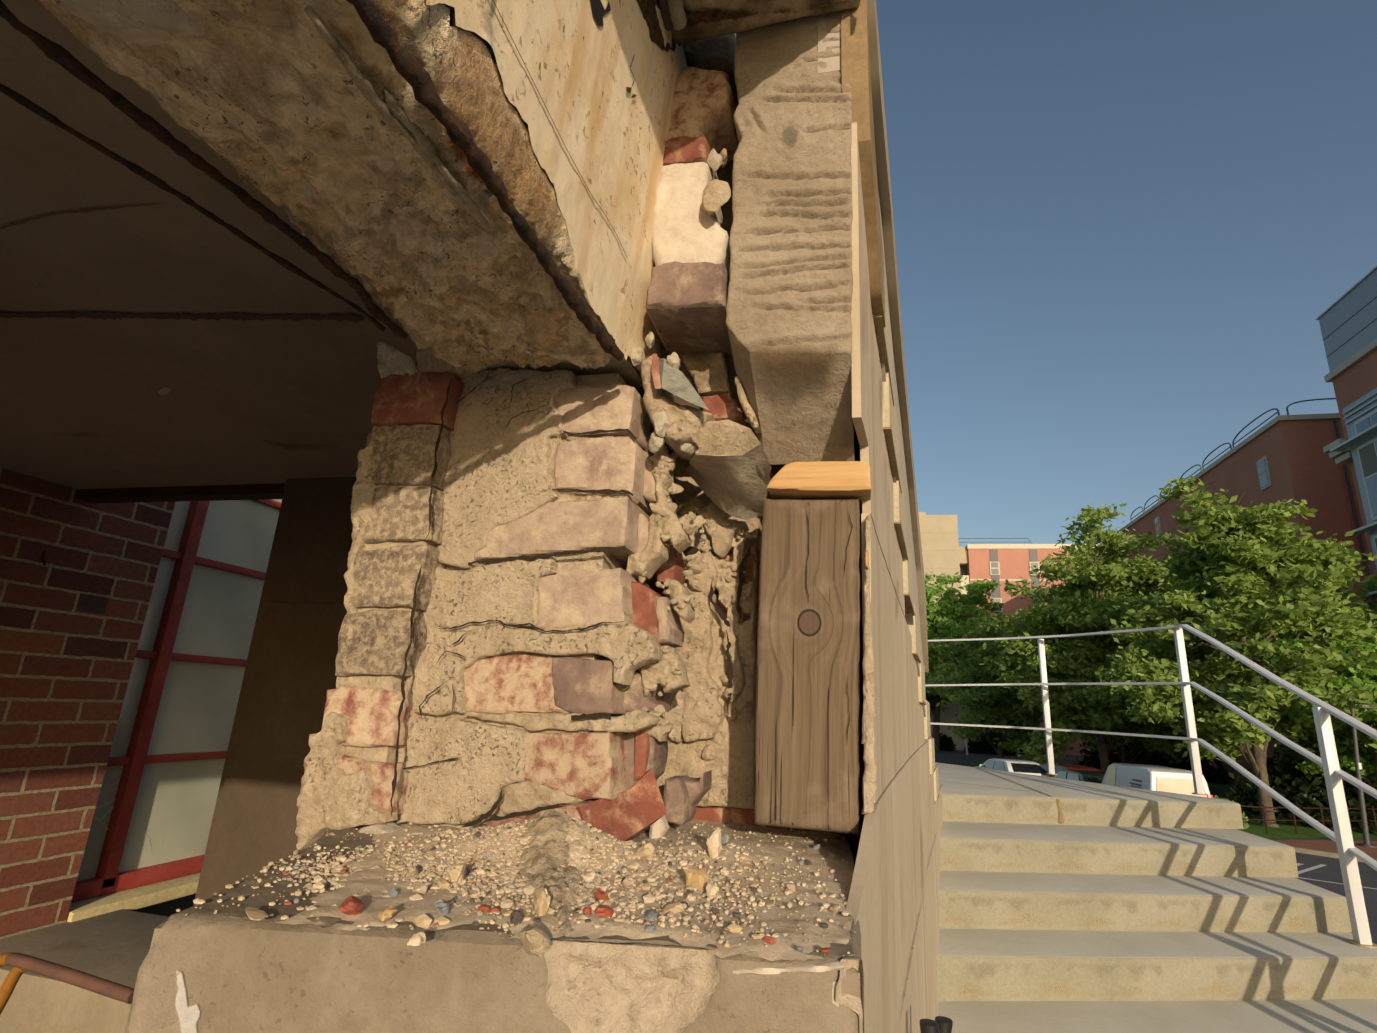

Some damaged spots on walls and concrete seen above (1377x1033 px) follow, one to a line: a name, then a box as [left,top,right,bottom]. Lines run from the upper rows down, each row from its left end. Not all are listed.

crack [0,203,161,229]
spalling [0,0,629,372]
crack [390,369,637,816]
leakage [175,971,200,1033]
spalling [543,940,864,1033]